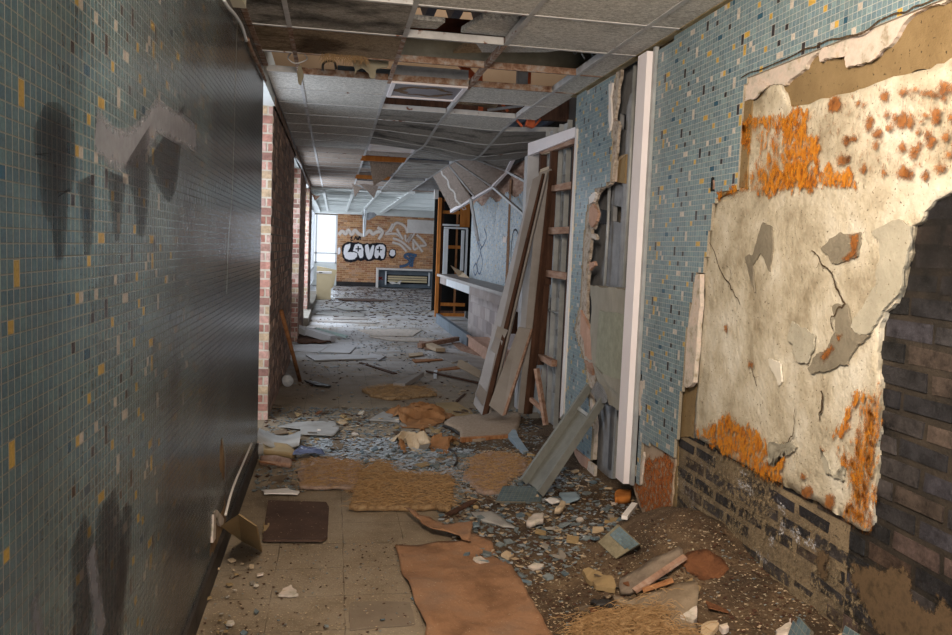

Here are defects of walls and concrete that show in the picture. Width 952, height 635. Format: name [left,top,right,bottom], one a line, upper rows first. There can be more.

flaking render [745,0,952,101]
corrosion [717,80,952,200]
flaking render [576,69,624,429]
flaking render [745,222,774,292]
peeling [768,358,783,386]
corrosion [635,453,674,512]
corrosion [692,413,785,483]
peeling [768,442,797,467]
corrosion [800,473,813,498]
peeling [820,448,846,481]
corrosion [825,382,883,531]